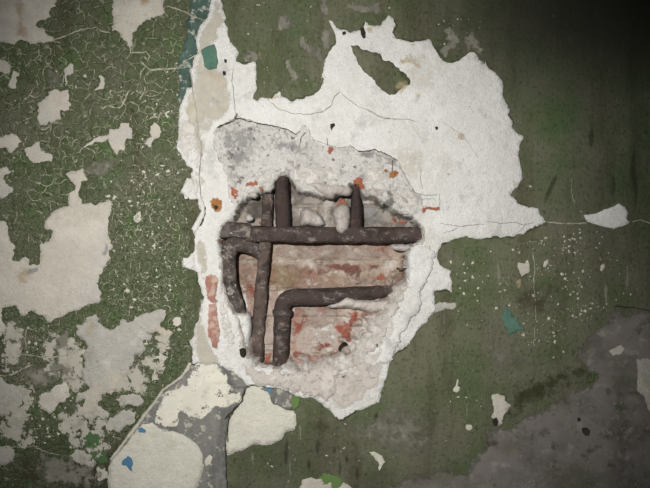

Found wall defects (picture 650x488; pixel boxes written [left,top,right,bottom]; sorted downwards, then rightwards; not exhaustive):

peeling [0,133,56,167]
peeling [0,0,58,47]
peeling [35,61,78,125]
peeling [0,167,116,372]
crack [0,6,206,357]
peeling [83,119,134,161]
peeling [94,0,547,488]
crack [217,73,586,233]
peeling [581,201,632,249]
peeling [0,377,41,449]
peeling [26,306,183,468]
peeling [391,229,650,488]